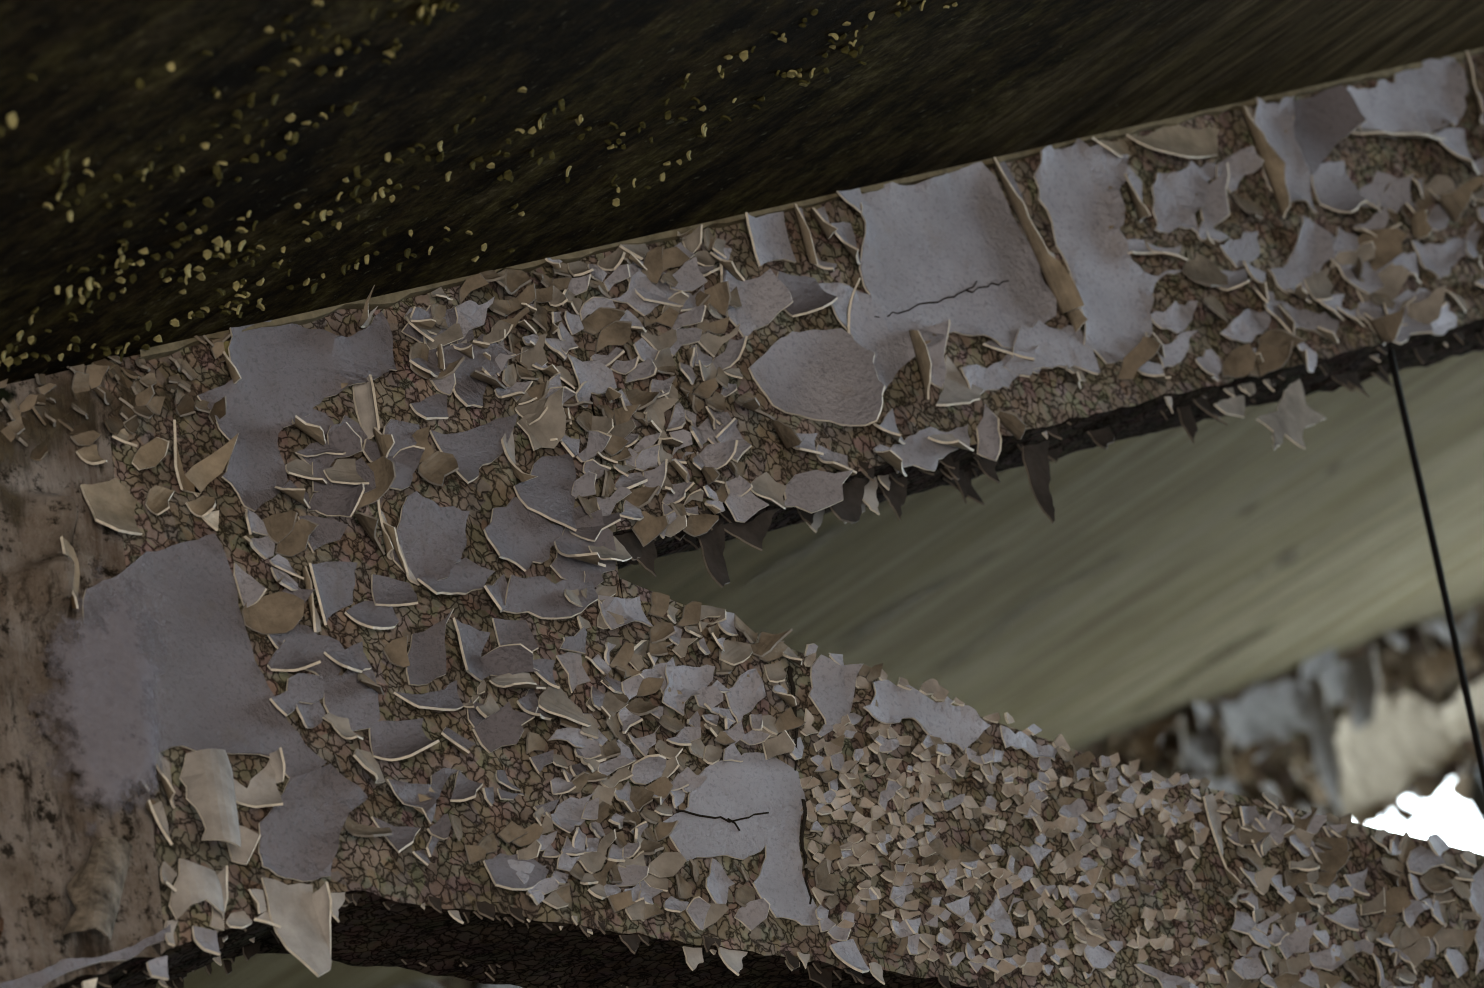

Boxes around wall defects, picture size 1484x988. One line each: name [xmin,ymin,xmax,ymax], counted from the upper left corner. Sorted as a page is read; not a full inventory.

peeling [1126,125,1219,158]
peeling [1152,50,1484,355]
peeling [0,373,107,465]
leakage [0,381,172,527]
crack [874,280,1009,318]
peeling [697,137,1250,588]
peeling [60,224,1484,988]
peeling [0,858,235,988]